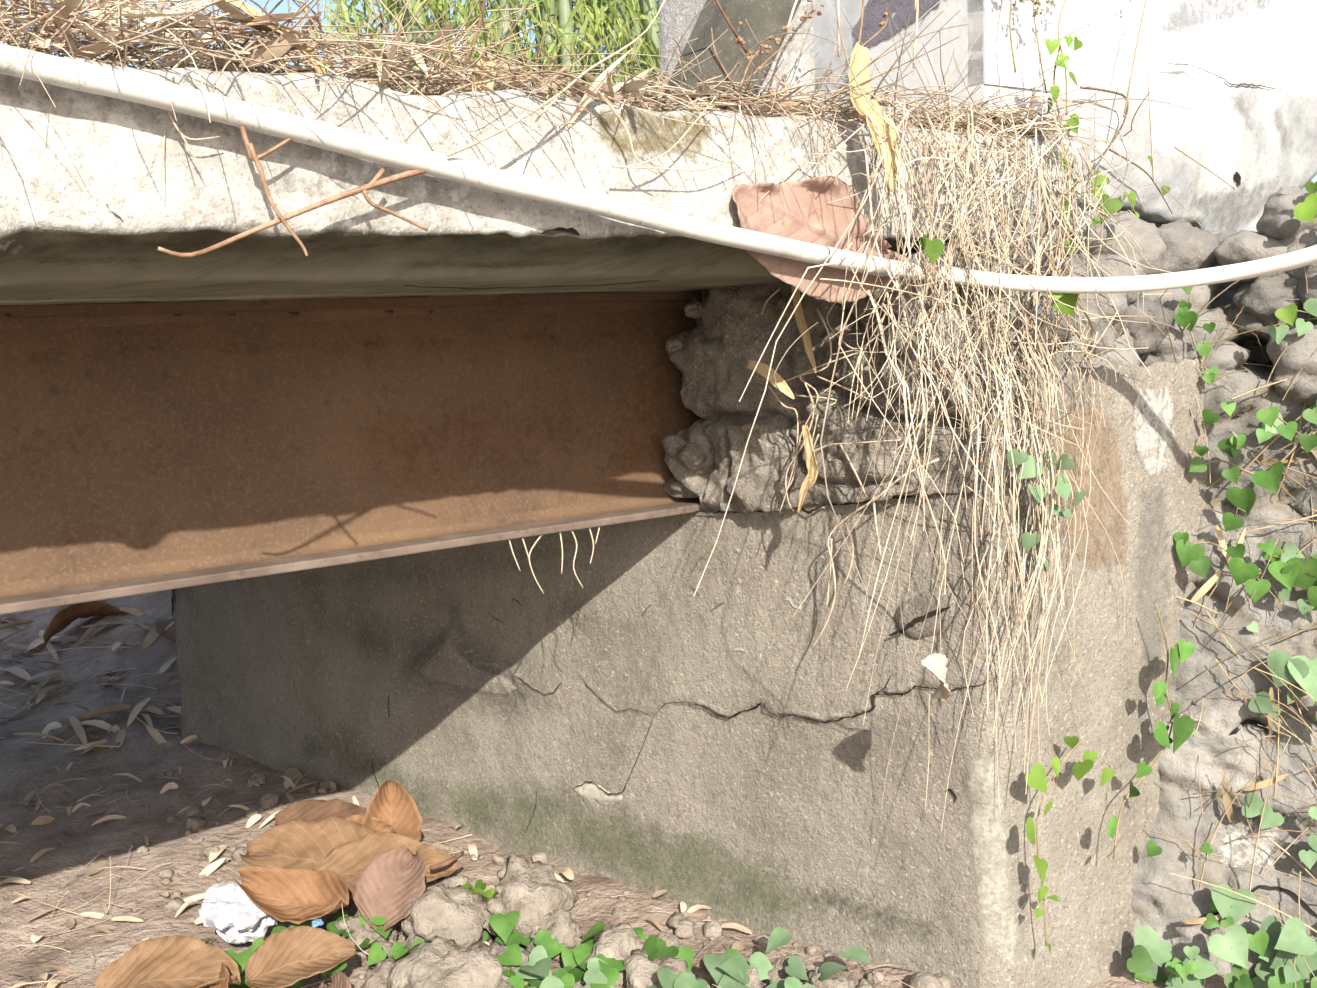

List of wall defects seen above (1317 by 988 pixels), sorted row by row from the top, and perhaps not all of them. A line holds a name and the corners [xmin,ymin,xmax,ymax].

crack [889,607,950,636]
crack [518,674,998,794]